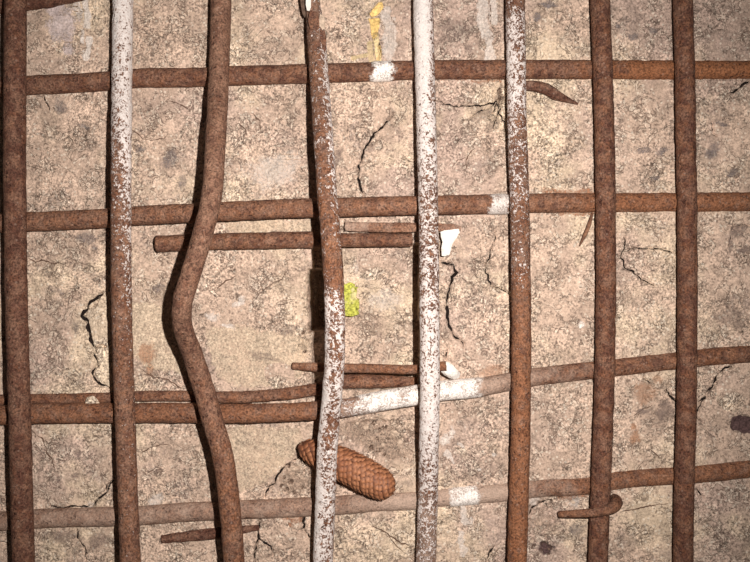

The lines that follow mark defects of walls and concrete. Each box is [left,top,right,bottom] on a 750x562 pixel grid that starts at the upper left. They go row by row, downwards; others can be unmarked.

crack [437,90,505,129]
crack [357,114,394,193]
crack [80,294,107,386]
spalling [0,0,420,562]
crack [441,262,464,357]
crack [475,236,506,292]
spalling [340,0,750,562]
crack [620,238,672,286]
crack [697,366,732,422]